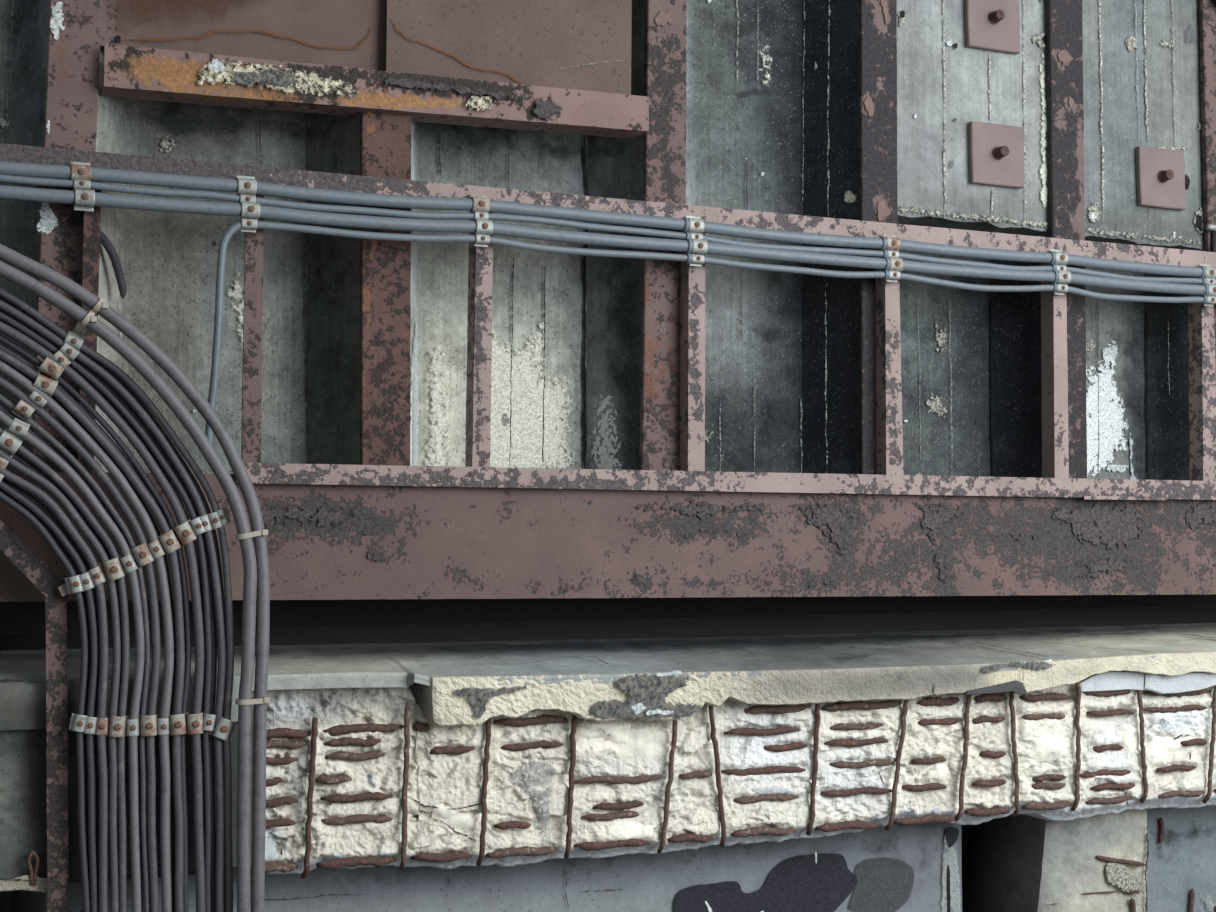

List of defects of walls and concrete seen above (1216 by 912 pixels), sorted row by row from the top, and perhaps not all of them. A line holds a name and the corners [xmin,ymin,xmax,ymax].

rust [116,0,632,95]
leakage [1086,341,1135,479]
peeling [1052,503,1145,550]
spalling [250,671,1216,912]
leakage [674,852,915,912]